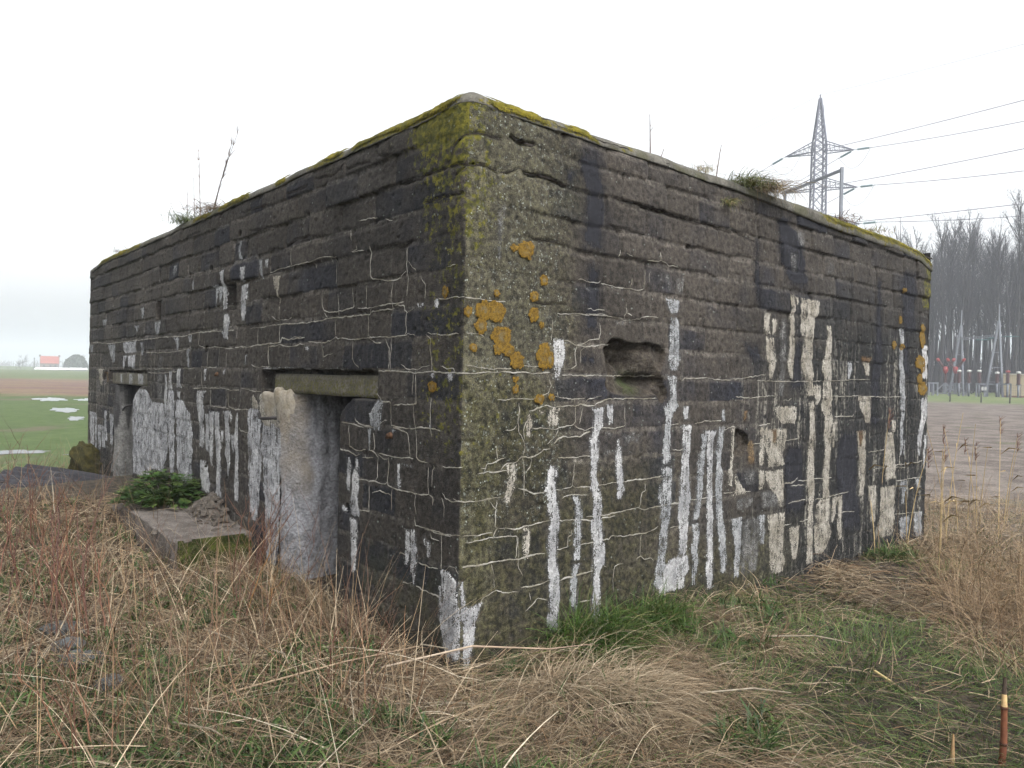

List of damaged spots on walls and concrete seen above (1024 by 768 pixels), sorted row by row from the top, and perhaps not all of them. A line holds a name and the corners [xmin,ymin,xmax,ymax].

crack [538,116,629,150]
damp [98,307,281,565]
damp [342,457,360,573]
damp [404,529,430,584]
crack [91,152,755,611]
damp [553,339,565,380]
damp [544,404,642,632]
damp [654,212,928,594]
crack [682,375,906,417]
crack [785,477,854,525]
crack [870,449,922,481]
damp [439,569,482,669]